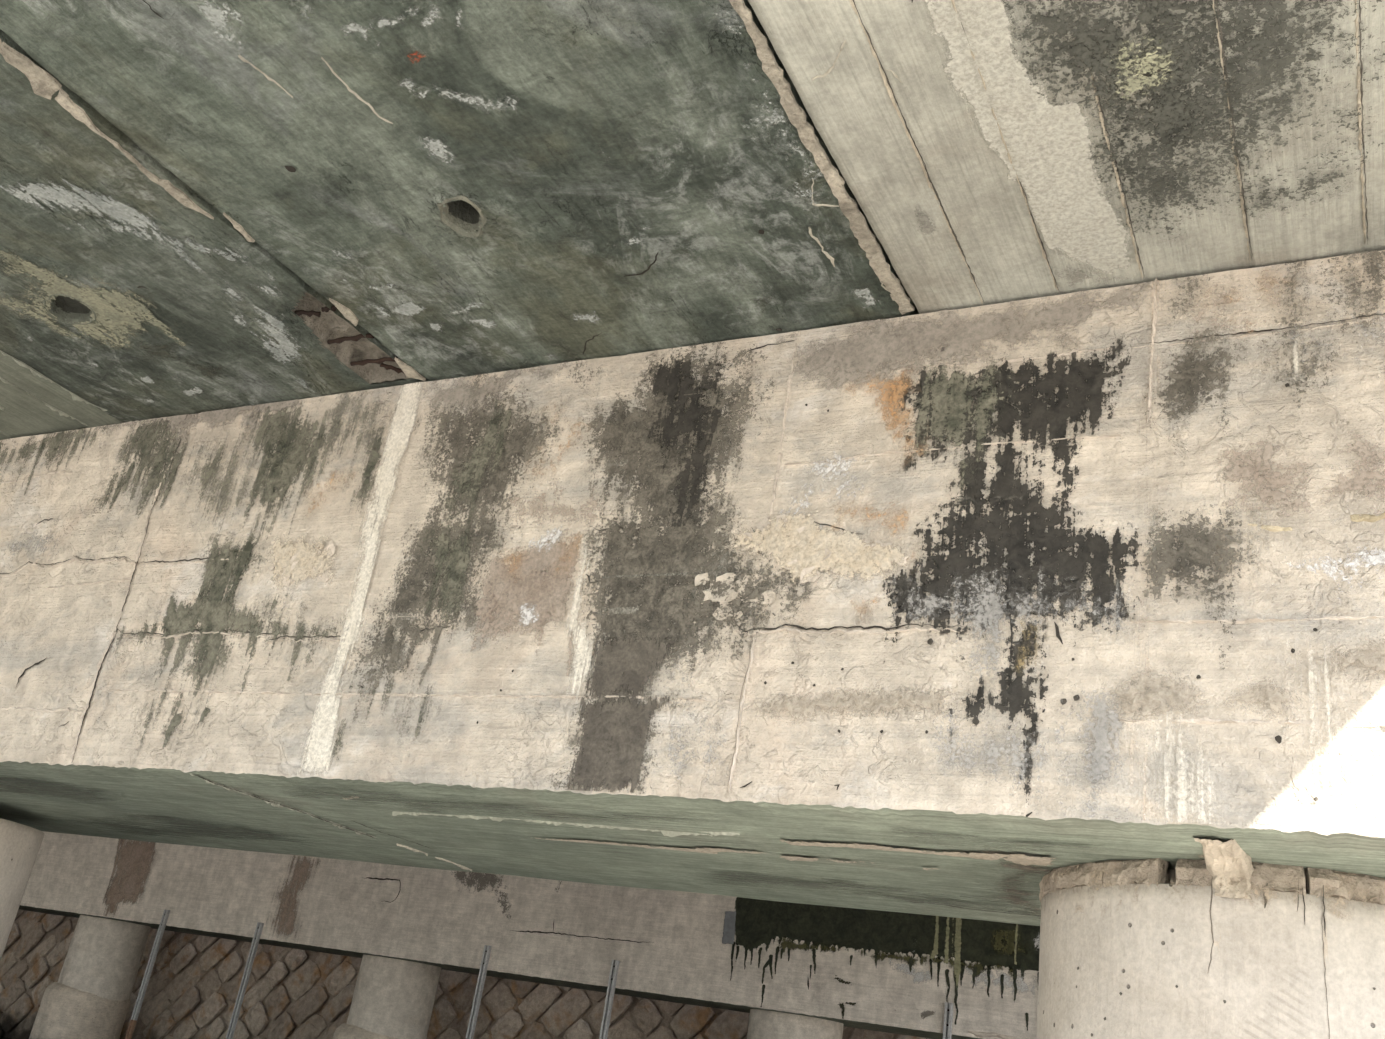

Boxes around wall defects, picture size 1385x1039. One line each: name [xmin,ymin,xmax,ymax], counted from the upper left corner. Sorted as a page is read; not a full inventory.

leakage [925,0,1385,285]
spalling [291,292,409,384]
leakage [852,288,875,308]
leakage [1272,250,1385,373]
crack [0,439,341,763]
leakage [191,539,254,631]
leakage [282,382,685,823]
leakage [551,342,814,794]
leakage [882,328,1256,805]
leakage [1164,729,1211,824]
leakage [699,832,1097,1031]
crack [1263,883,1330,1039]